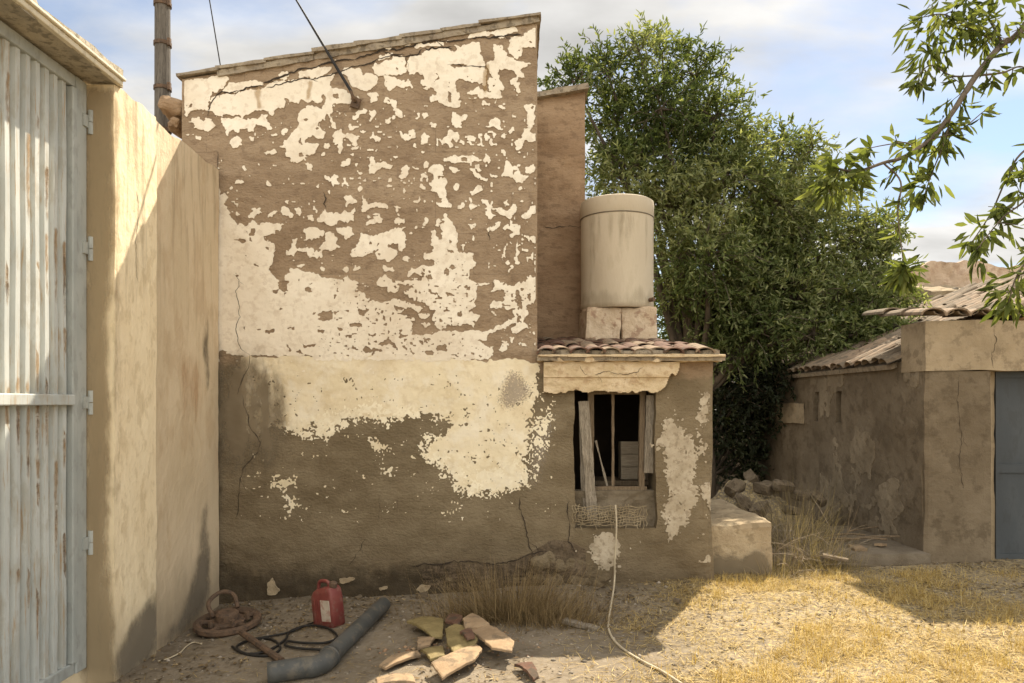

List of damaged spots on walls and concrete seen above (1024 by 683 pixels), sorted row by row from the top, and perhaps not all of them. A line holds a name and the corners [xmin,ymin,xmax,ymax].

crack [208,33,521,112]
peeling [184,26,556,522]
crack [235,275,261,517]
water stain [218,358,556,500]
crack [412,500,575,569]
spalling [417,532,641,593]
peeling [638,392,711,543]